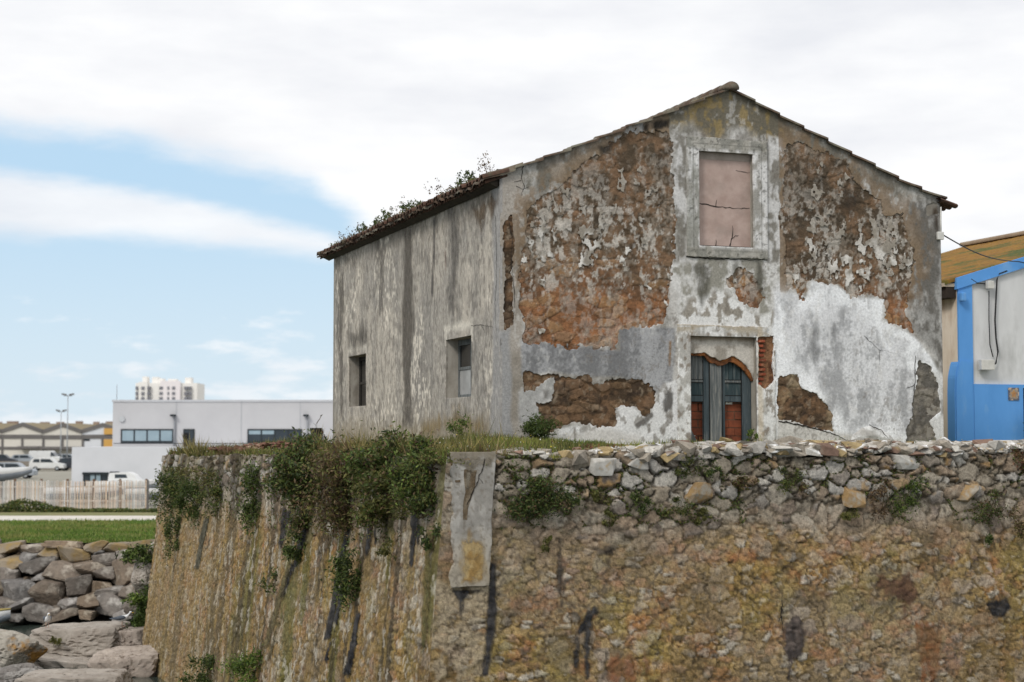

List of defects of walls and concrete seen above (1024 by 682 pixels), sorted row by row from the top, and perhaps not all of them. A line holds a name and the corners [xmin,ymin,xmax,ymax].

leakage [402,231,414,424]
flaking render [502,128,677,351]
flaking render [726,267,765,308]
flaking render [778,142,916,333]
flaking render [523,370,656,433]
flaking render [691,336,834,432]
flaking render [906,360,940,442]
leakage [264,508,309,660]
leakage [324,529,350,663]
leakage [343,612,360,675]
leakage [453,563,497,675]
leakage [573,606,597,679]